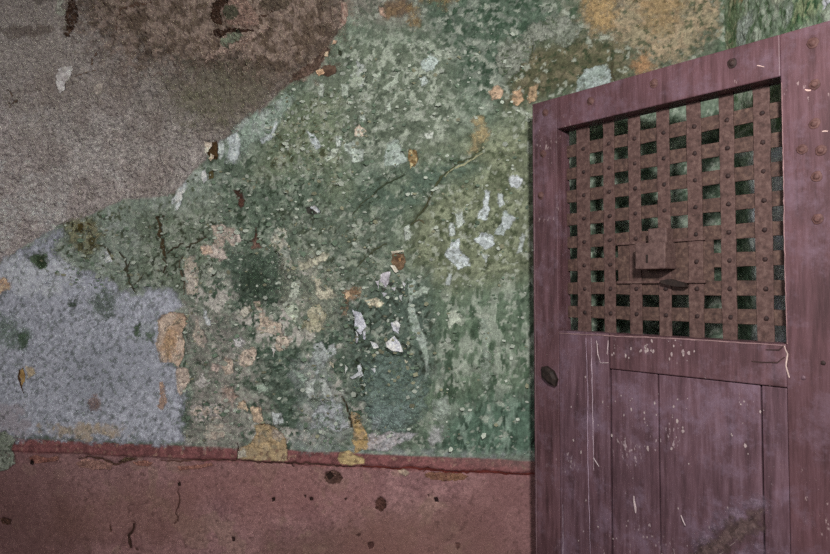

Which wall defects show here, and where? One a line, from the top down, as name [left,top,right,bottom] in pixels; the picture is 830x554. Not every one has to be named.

peeling [449,15,582,122]
crack [352,174,405,214]
crack [409,148,483,226]
spalling [0,0,527,471]
crack [357,243,387,267]